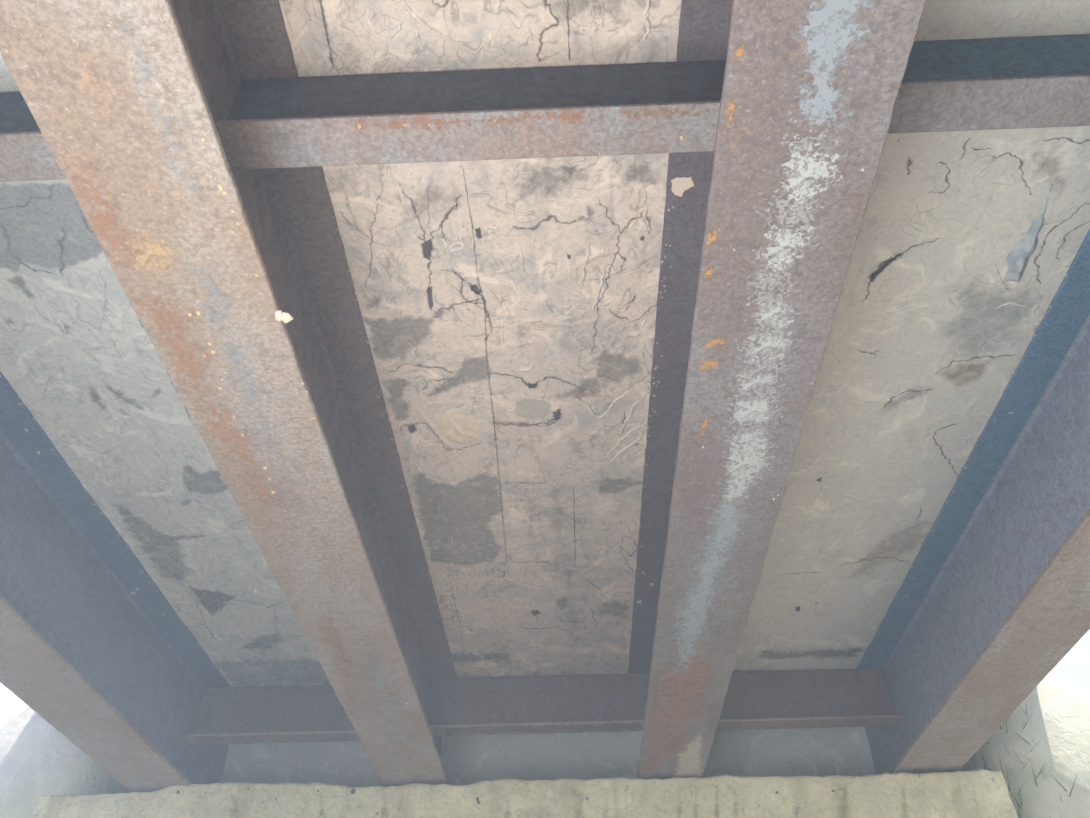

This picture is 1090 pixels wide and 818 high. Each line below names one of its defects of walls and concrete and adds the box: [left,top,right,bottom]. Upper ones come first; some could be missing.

crack [319,0,333,66]
crack [537,0,570,61]
spalling [671,177,694,197]
crack [907,138,1031,195]
crack [0,184,94,275]
crack [591,199,657,352]
crack [862,238,939,302]
crack [1034,203,1088,283]
crack [339,169,643,588]
corrosion [697,339,725,370]
crack [885,354,1014,406]
damp [416,475,501,565]